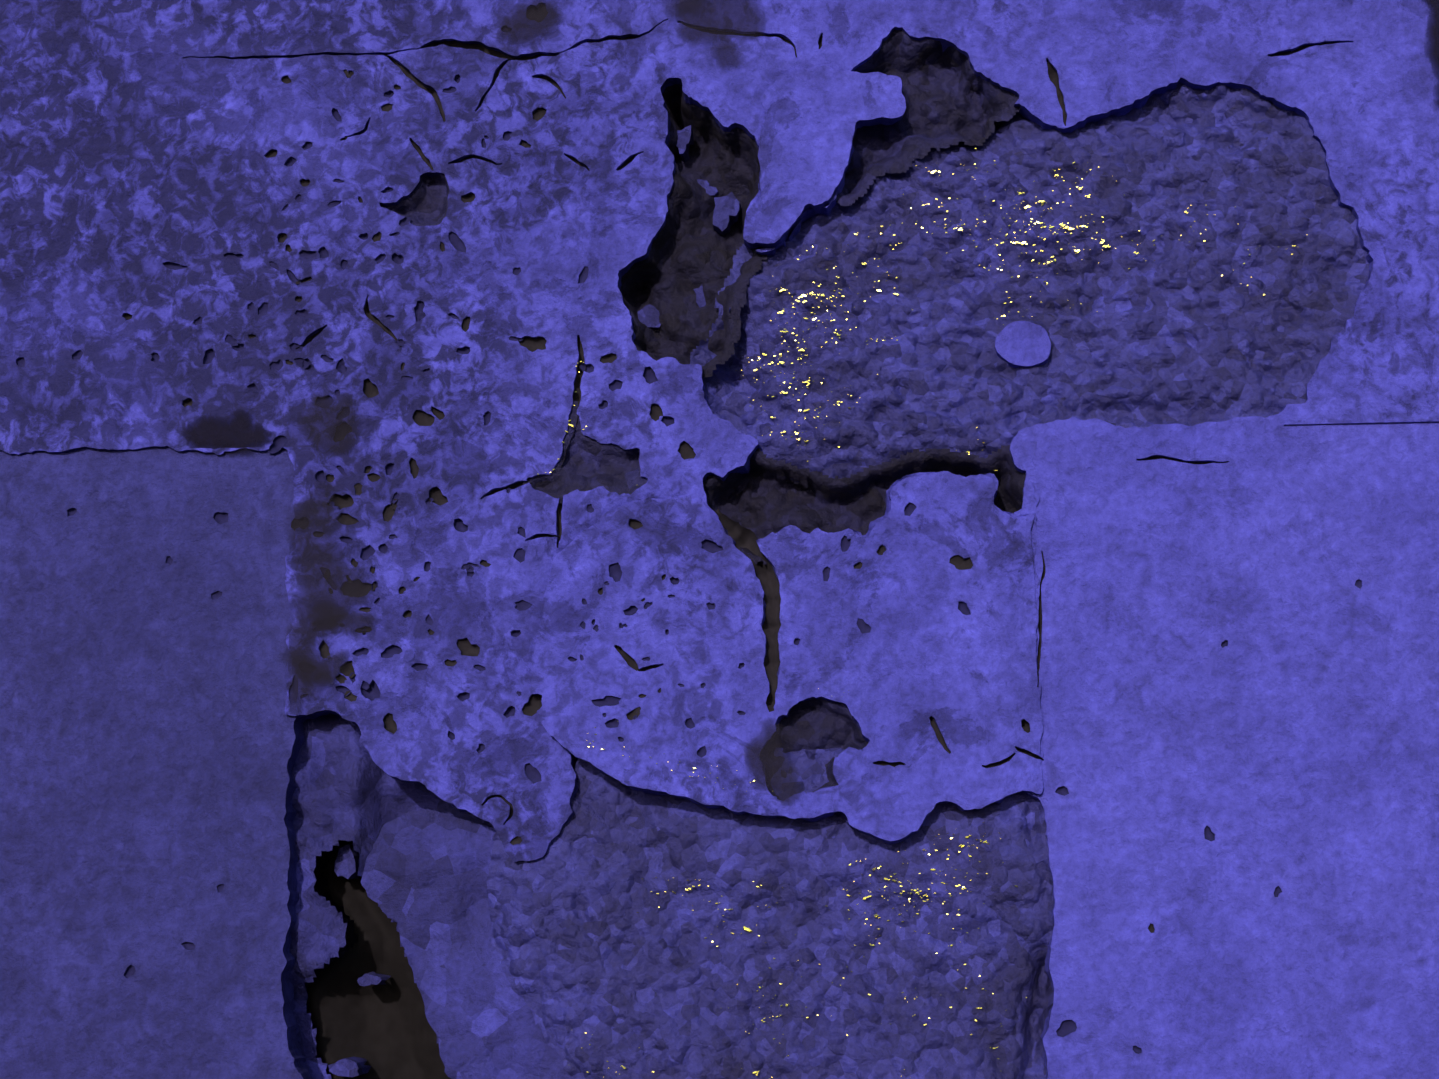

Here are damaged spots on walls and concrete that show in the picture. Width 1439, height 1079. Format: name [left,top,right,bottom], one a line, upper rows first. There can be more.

spalling [620,30,1370,570]
spalling [509,337,547,352]
spalling [507,391,648,513]
spalling [316,458,419,702]
crack [715,508,781,712]
crack [1037,552,1045,687]
crack [615,645,660,671]
spalling [504,691,542,718]
spalling [592,688,661,742]
crack [873,760,905,768]
crack [929,717,951,754]
crack [982,719,1044,768]